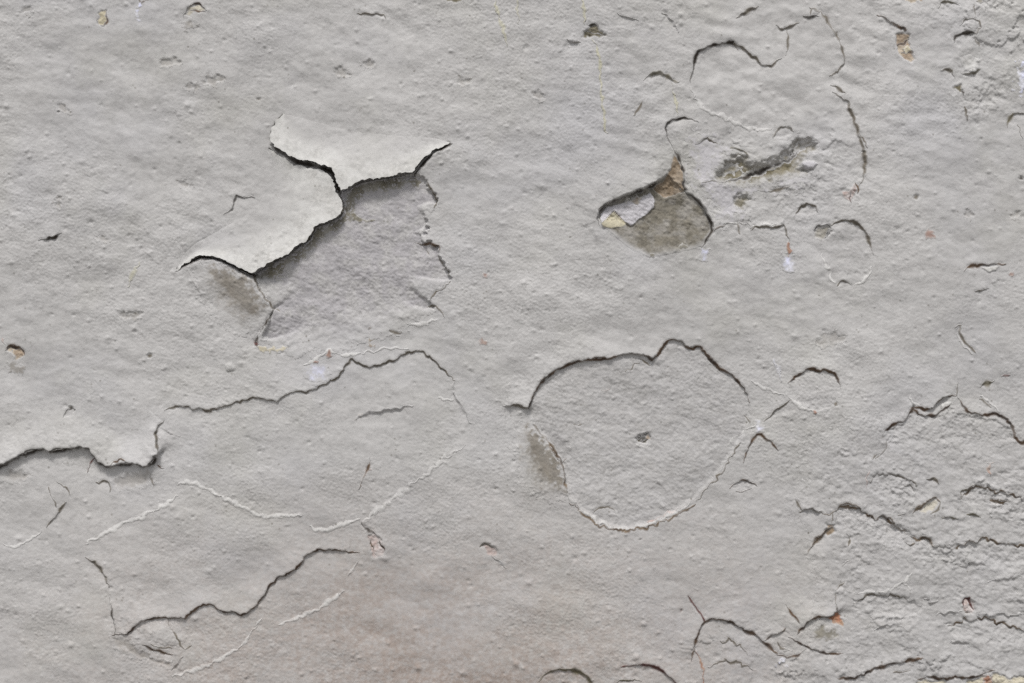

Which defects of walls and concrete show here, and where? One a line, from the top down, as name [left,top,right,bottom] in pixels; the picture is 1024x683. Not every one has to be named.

crack [689,7,868,186]
flaking render [176,113,453,360]
spalling [596,115,826,258]
crack [725,221,790,240]
crack [0,350,470,527]
crack [795,373,1024,607]
crack [85,548,359,670]
crack [539,662,677,683]
crack [688,595,996,683]